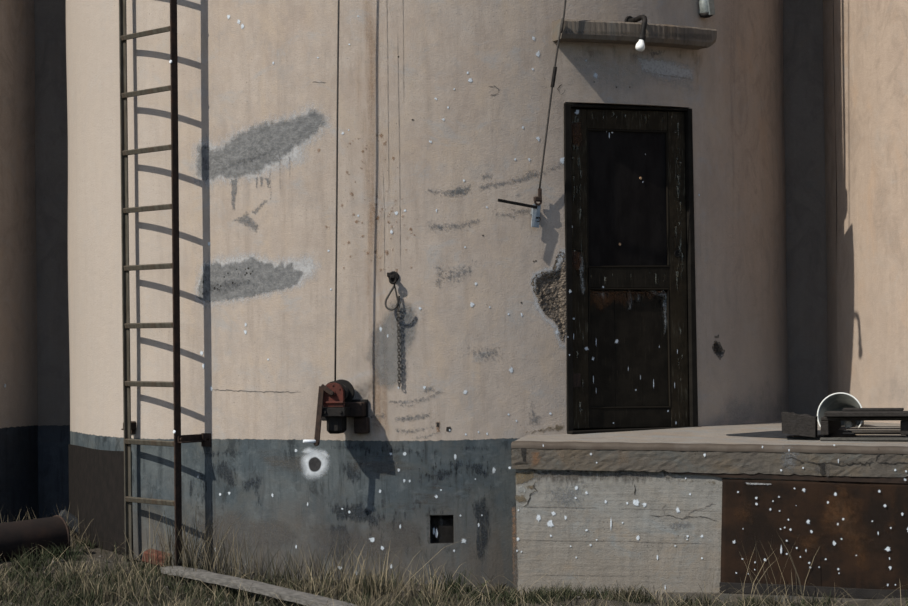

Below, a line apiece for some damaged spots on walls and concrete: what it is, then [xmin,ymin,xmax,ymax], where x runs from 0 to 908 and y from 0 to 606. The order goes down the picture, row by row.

spalling [531,250,597,360]
water stain [370,303,414,385]
spalling [712,335,725,360]
crack [784,448,908,469]
crack [625,484,719,522]
corrosion [824,497,862,557]